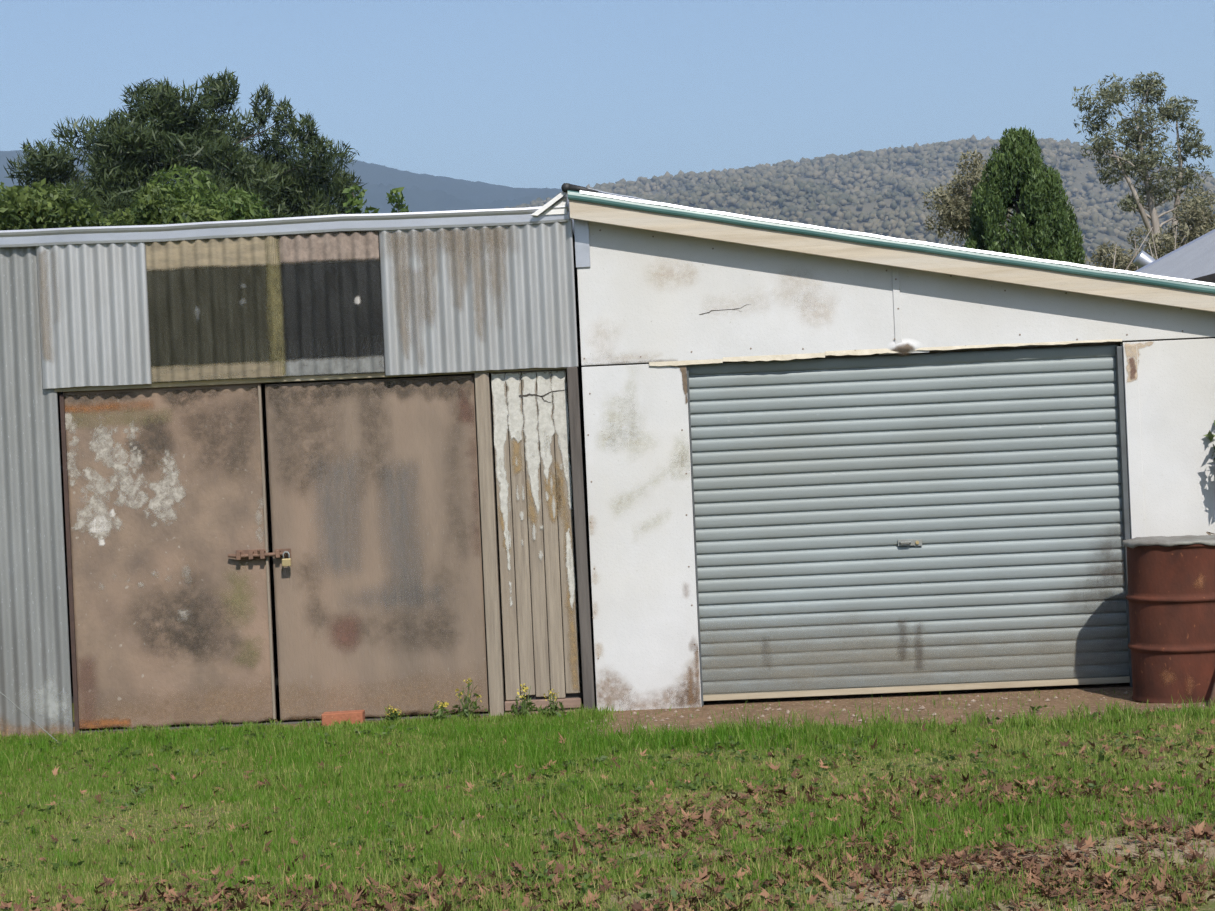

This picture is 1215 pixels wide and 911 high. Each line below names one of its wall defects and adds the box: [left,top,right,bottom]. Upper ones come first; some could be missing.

peeling [65,413,184,545]
peeling [491,371,577,689]